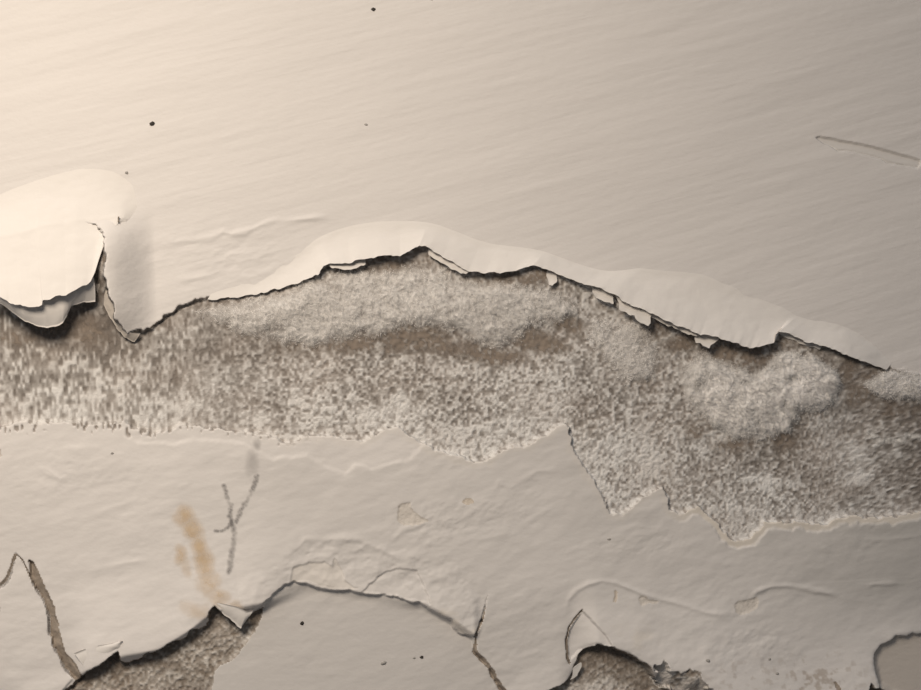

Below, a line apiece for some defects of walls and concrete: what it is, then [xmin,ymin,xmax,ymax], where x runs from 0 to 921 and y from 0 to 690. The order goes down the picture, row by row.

flaking render [0,224,921,542]
water stain [669,335,921,451]
crack [0,554,82,680]
peeling [0,533,488,690]
crack [472,608,506,690]
flaking render [549,644,713,690]
peeling [869,633,921,690]